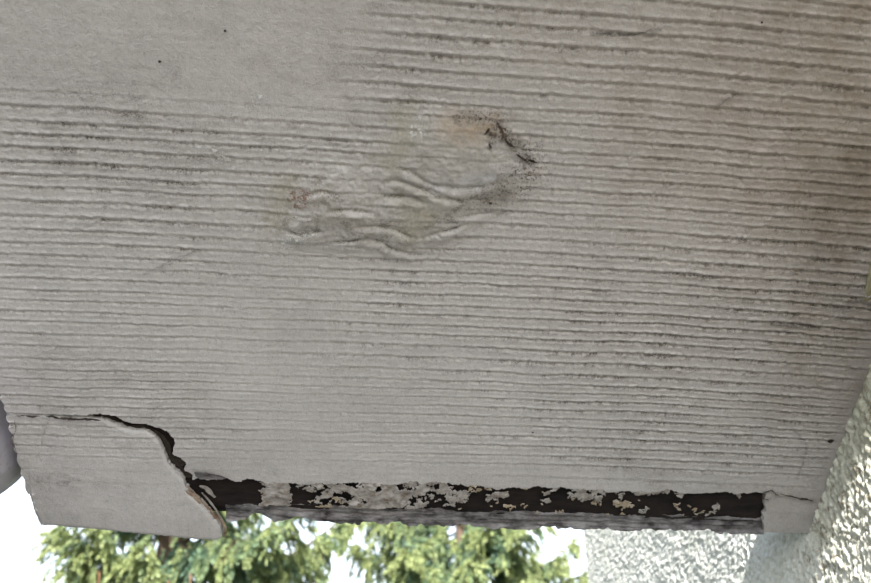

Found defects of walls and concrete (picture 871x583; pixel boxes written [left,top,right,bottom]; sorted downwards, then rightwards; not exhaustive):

crack [12,414,193,478]
flaking render [28,414,764,540]